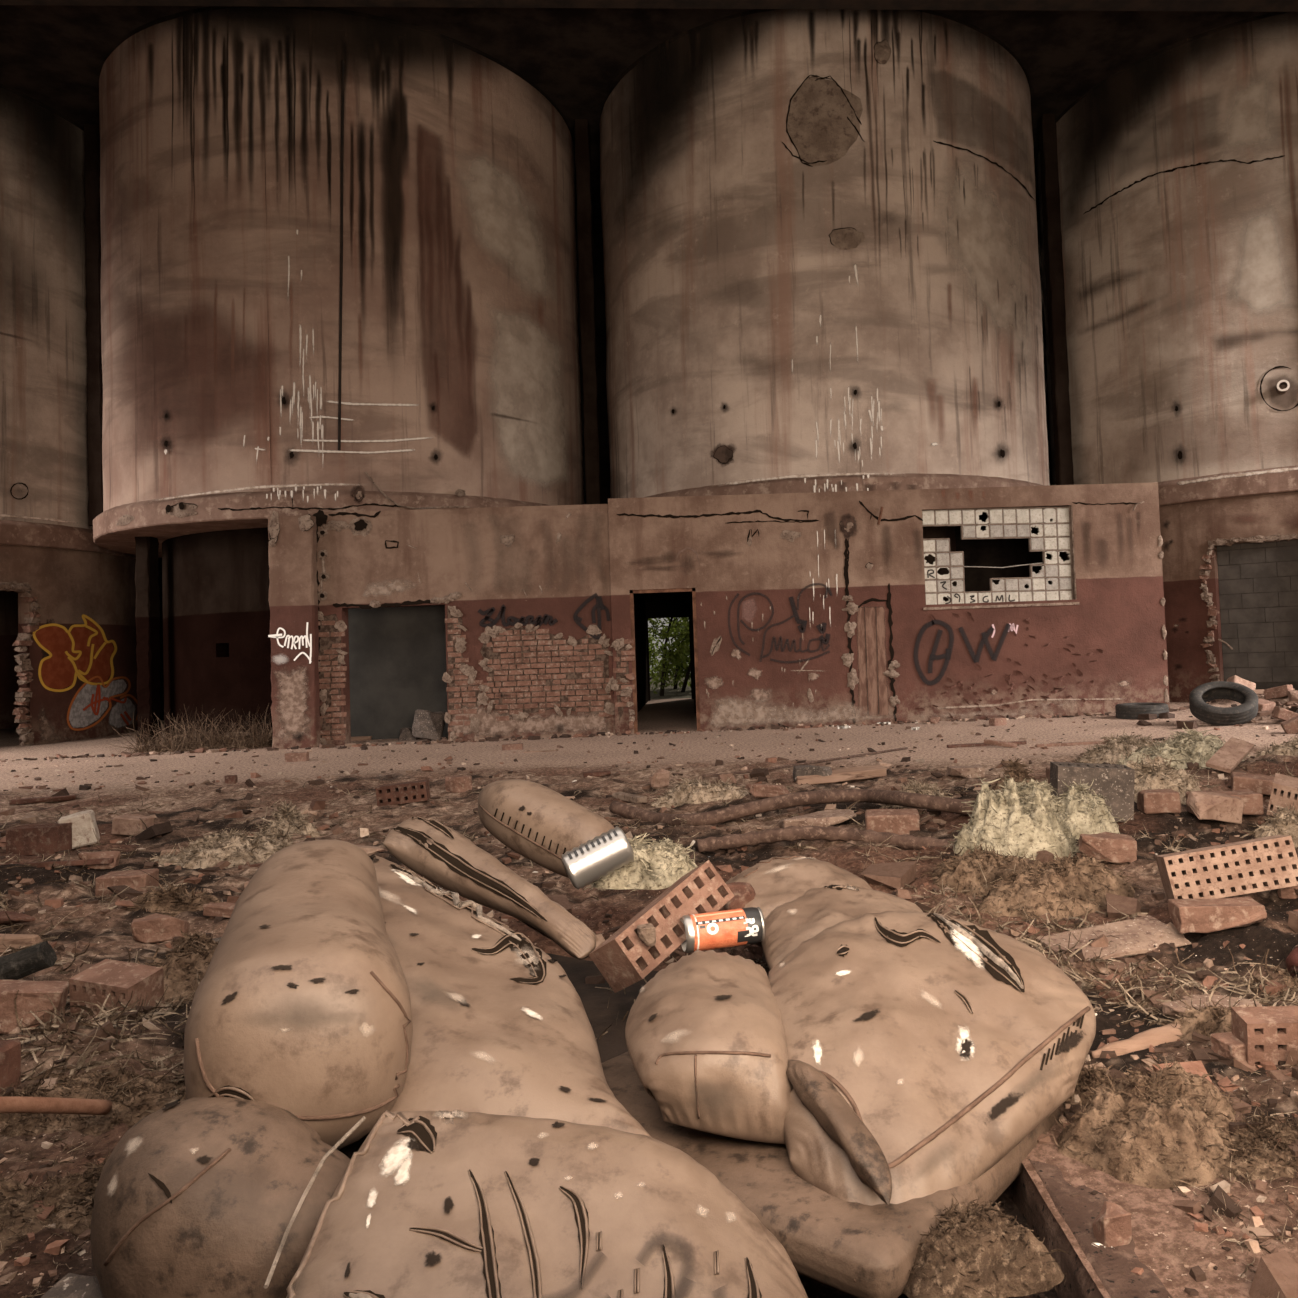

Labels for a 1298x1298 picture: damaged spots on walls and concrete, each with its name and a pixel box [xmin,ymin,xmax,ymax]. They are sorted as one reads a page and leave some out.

leakage [172,9,331,202]
leakage [350,93,408,310]
spalling [782,75,865,167]
flaking render [430,592,635,741]
crack [616,510,819,524]
crack [841,501,923,724]